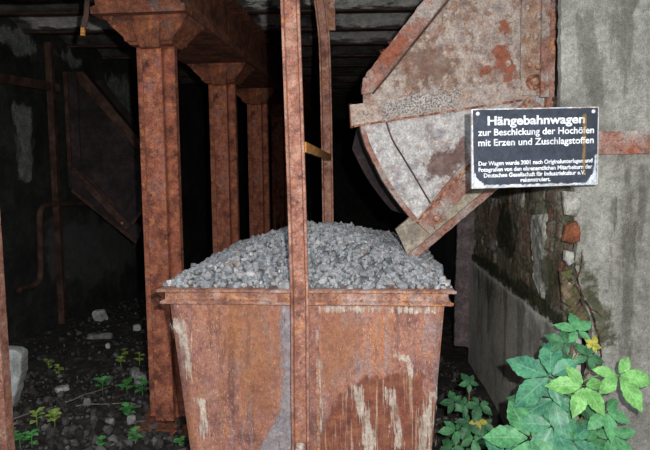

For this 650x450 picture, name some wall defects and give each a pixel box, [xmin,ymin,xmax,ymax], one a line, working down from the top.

spalling [472,186,590,334]